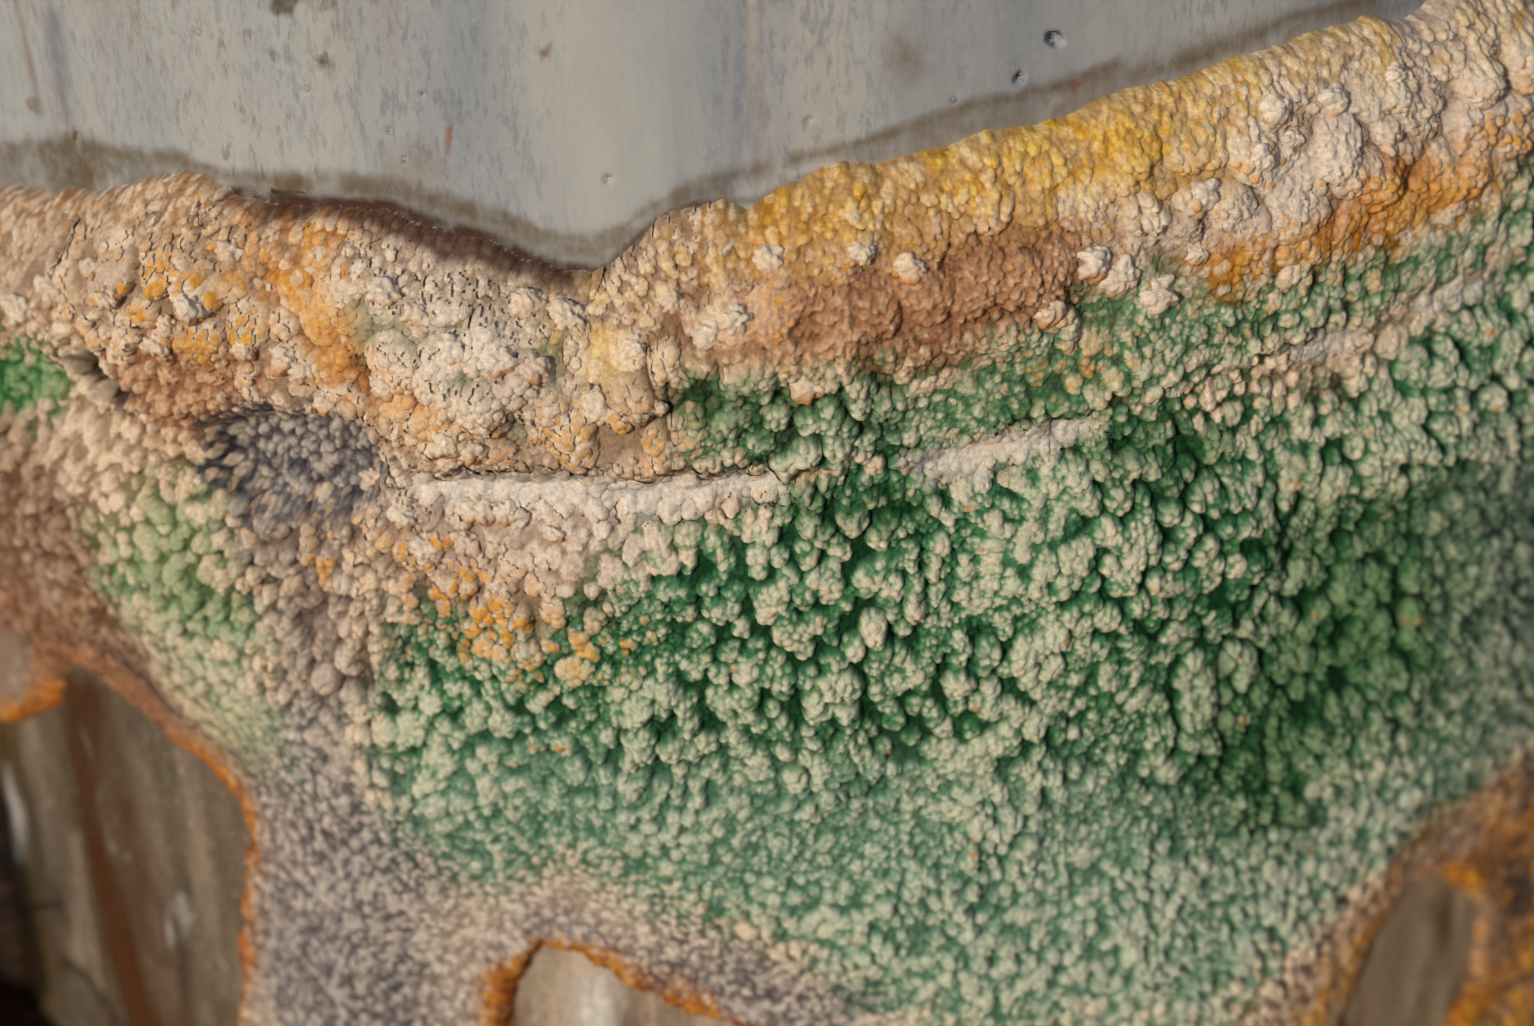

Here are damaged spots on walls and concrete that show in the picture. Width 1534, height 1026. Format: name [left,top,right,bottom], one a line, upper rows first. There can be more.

water stain [1441,165,1459,184]
water stain [1067,198,1086,220]
water stain [811,243,836,266]
water stain [428,329,466,366]
water stain [429,380,458,402]
water stain [481,347,558,425]
water stain [211,528,230,551]
water stain [297,519,339,595]
water stain [282,574,309,597]
peeling [0,664,253,1026]
peeling [1340,871,1476,1026]
peeling [512,945,735,1026]